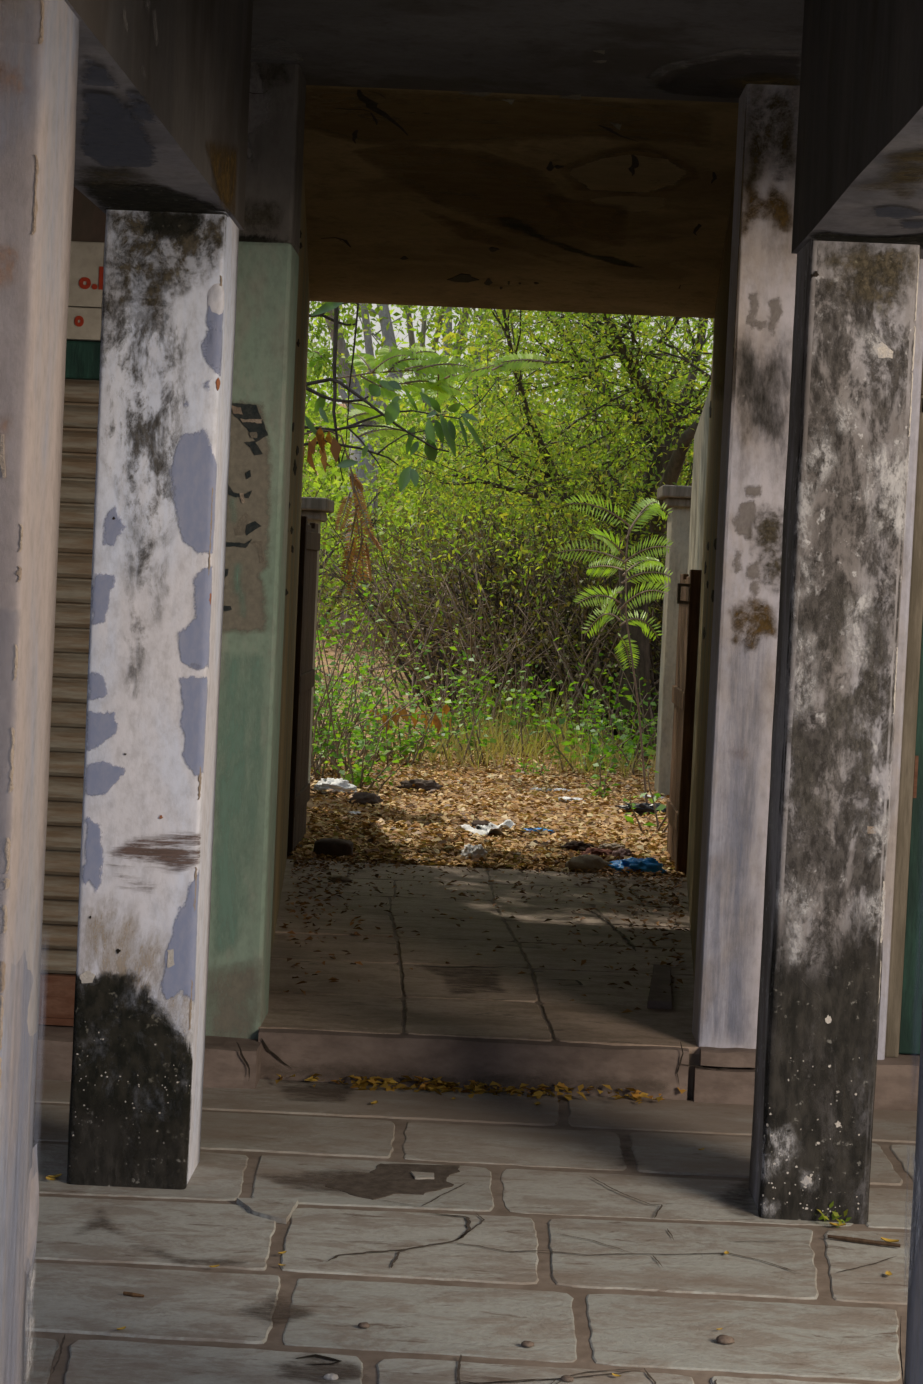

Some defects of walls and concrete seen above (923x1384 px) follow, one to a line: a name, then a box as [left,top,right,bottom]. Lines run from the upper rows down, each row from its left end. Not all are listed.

peeling [103,507,125,546]
peeling [91,574,116,625]
damp [306,49,923,1224]
peeling [85,672,126,796]
peeling [82,817,103,892]
peeling [79,971,95,983]
peeling [160,867,199,1030]
damp [67,914,193,1190]
crack [328,1176,801,1274]
crack [455,1354,656,1384]